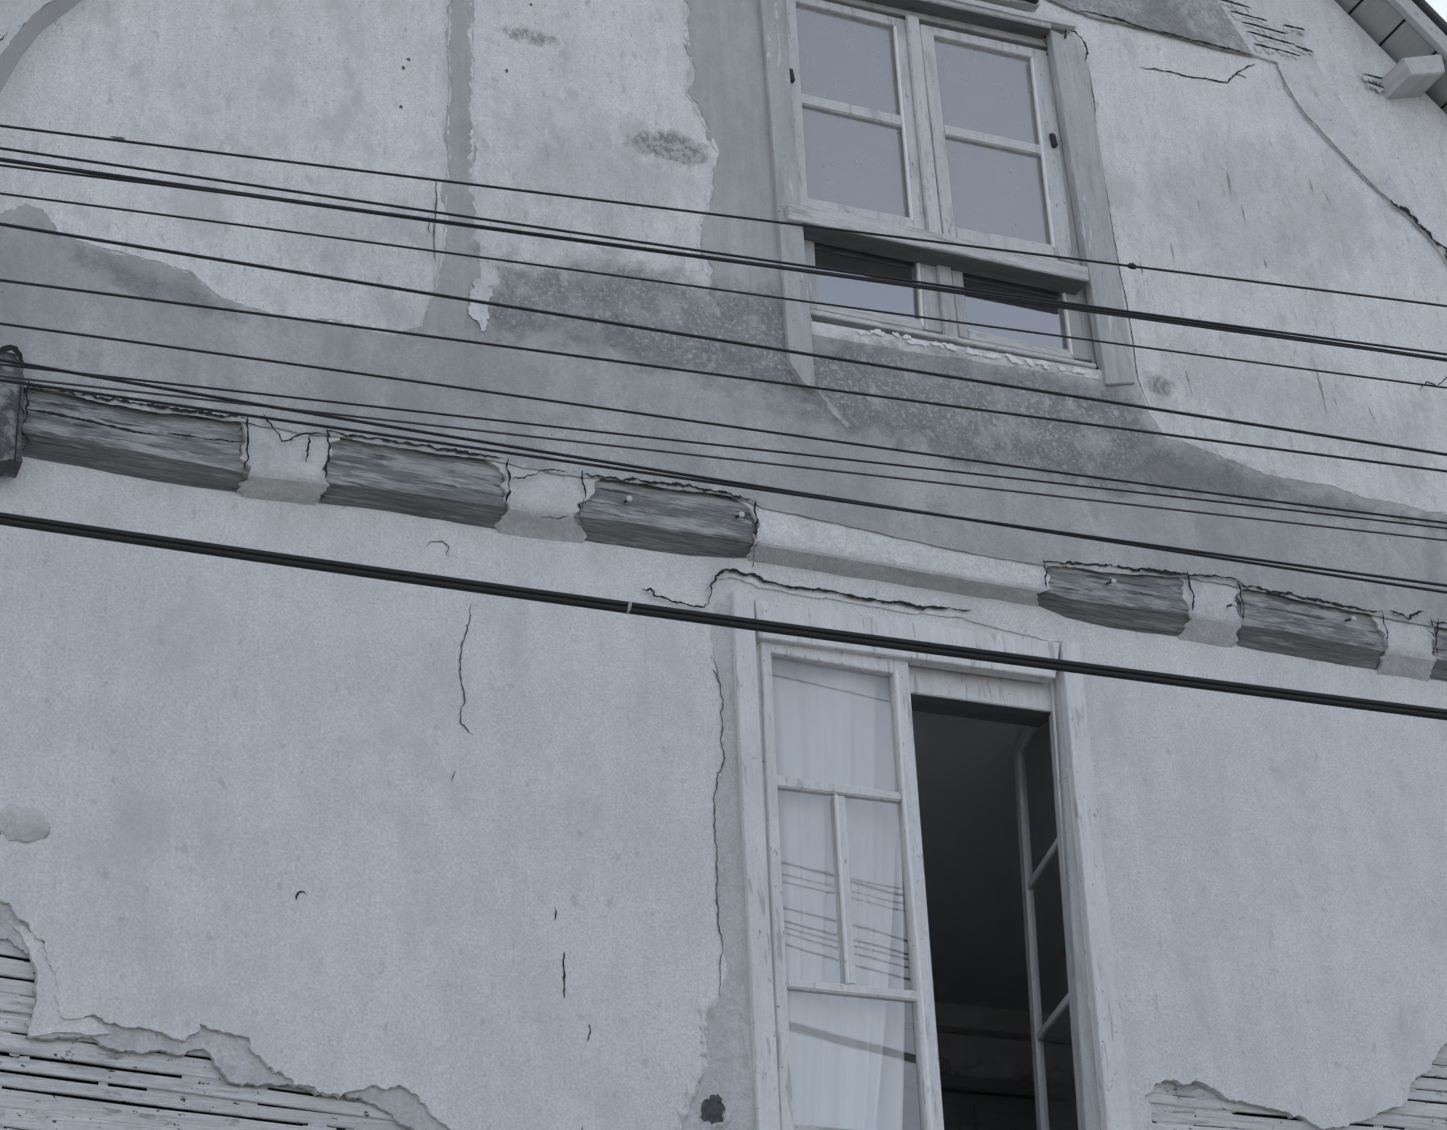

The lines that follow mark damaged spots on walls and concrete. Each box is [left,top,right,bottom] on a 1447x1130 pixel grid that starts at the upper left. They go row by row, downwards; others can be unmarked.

crack [1064,10,1447,258]
peeling [0,0,1447,682]
crack [1104,177,1148,403]
crack [459,606,472,734]
crack [642,541,971,611]
crack [713,660,725,995]
spalling [0,924,410,1130]
spalling [675,966,756,1130]
spalling [1145,1044,1447,1130]